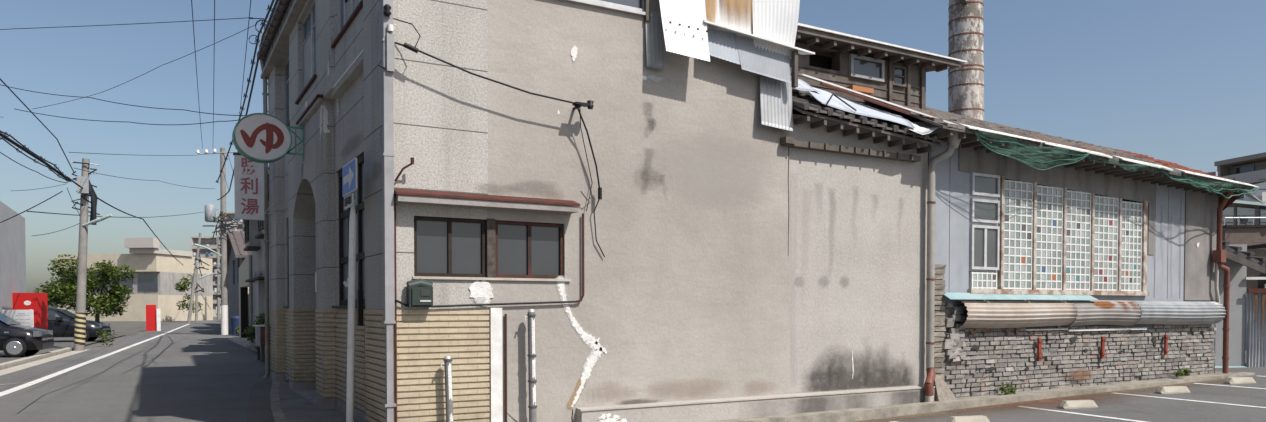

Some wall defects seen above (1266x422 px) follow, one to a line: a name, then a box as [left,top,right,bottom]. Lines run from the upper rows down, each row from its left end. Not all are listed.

rust [705,0,752,22]
leakage [811,351,911,391]